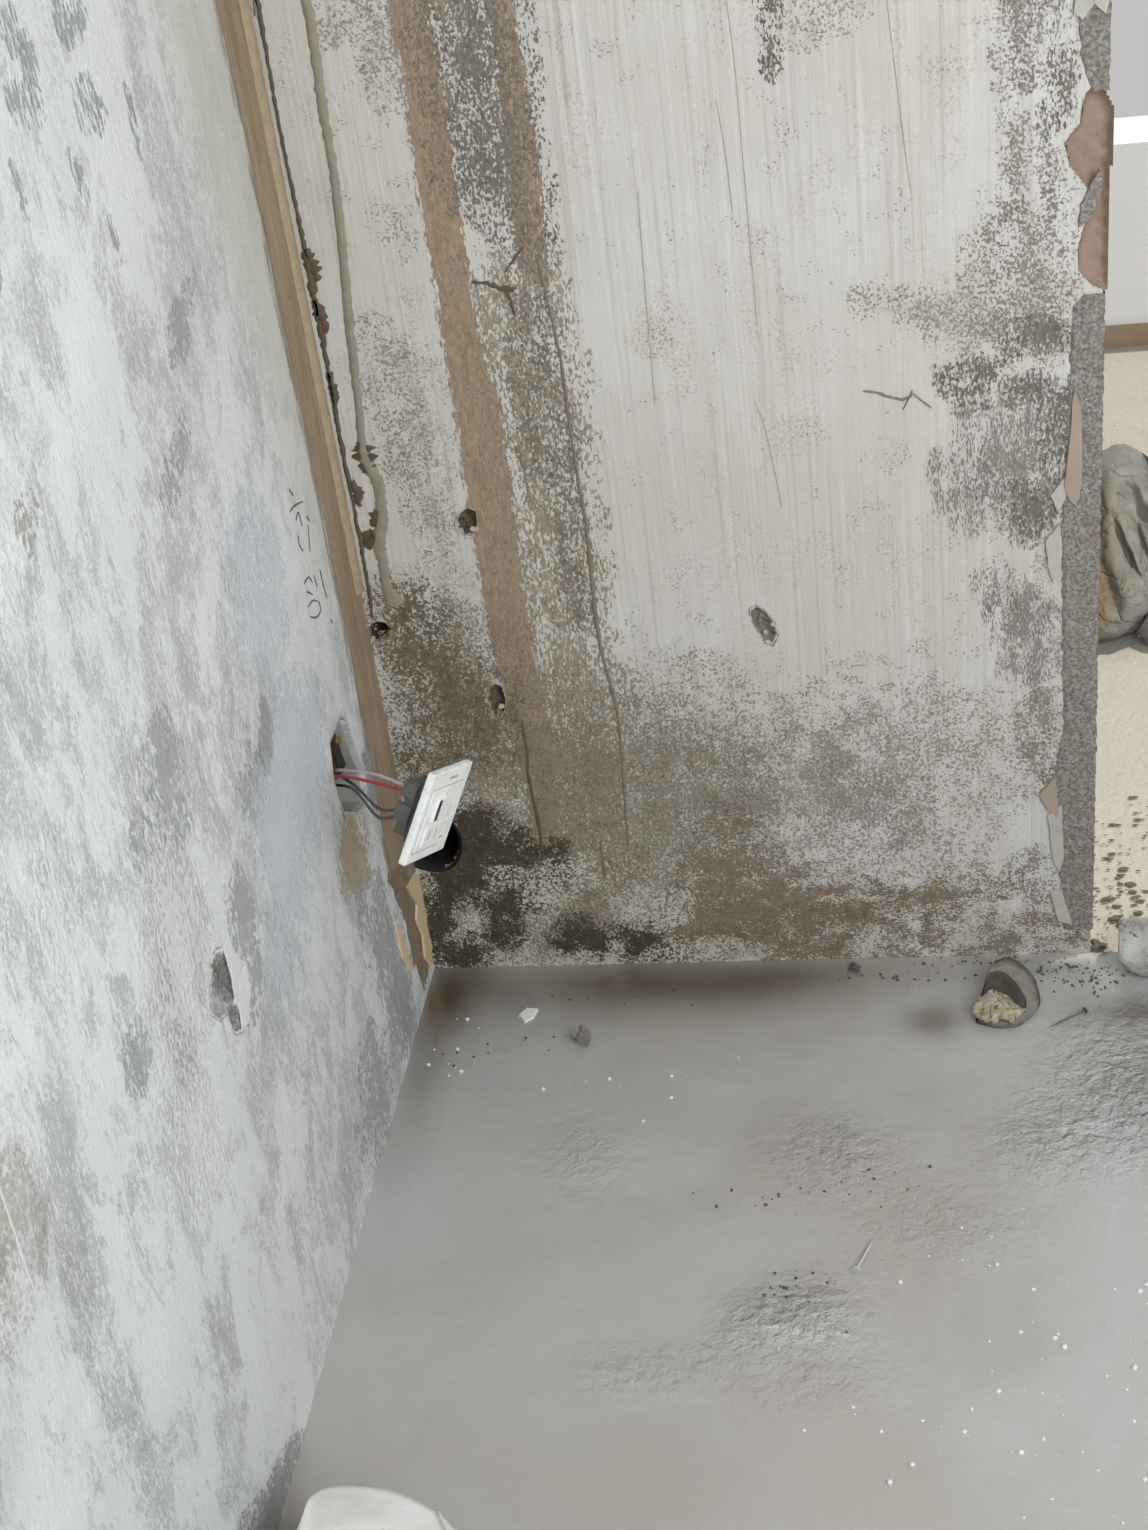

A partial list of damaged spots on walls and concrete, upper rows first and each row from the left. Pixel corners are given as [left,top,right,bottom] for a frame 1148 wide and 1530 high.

damp [215,0,1111,968]
spalling [581,0,1114,930]
spalling [210,859,266,1036]
peeling [122,1014,153,1105]
peeling [174,1015,199,1096]